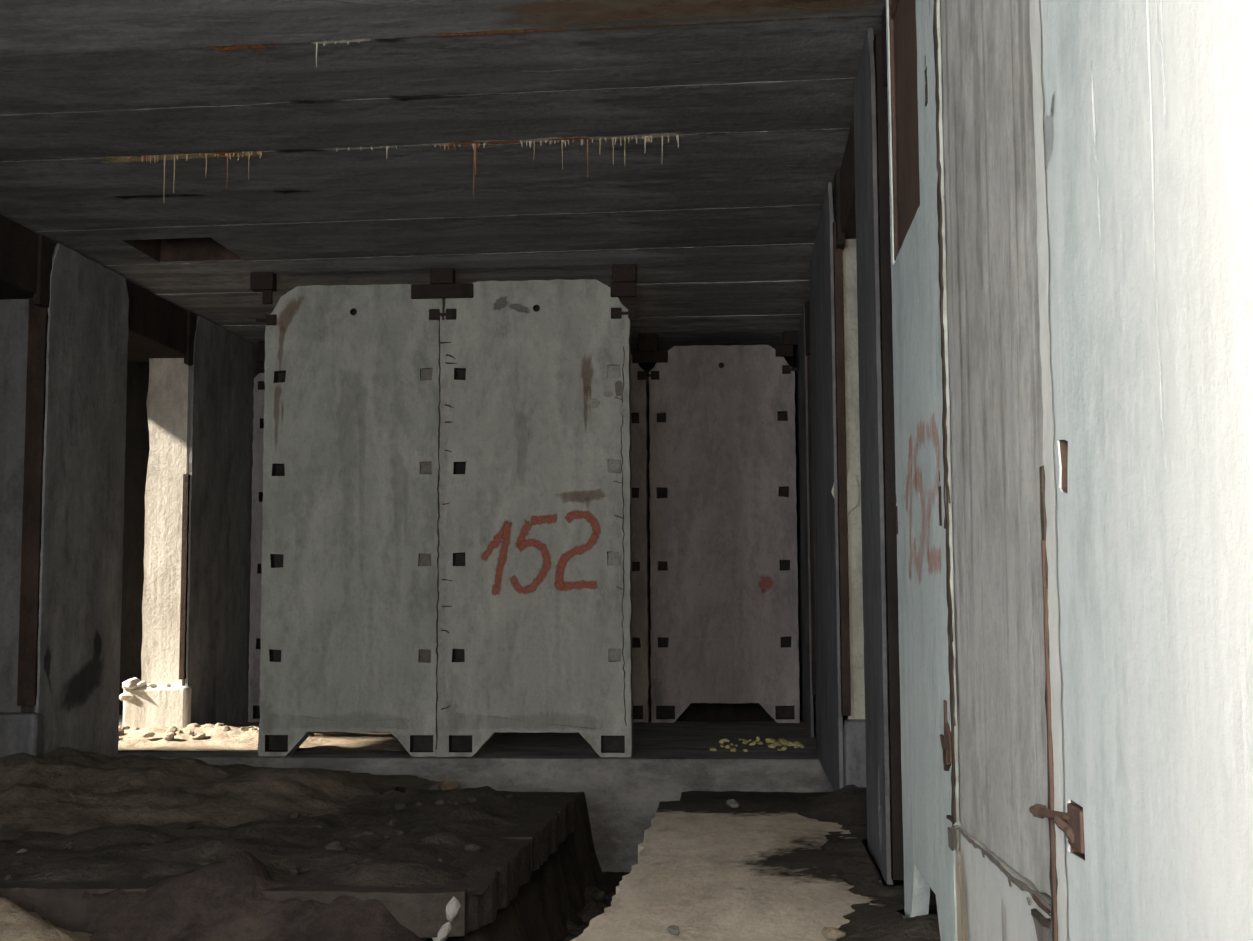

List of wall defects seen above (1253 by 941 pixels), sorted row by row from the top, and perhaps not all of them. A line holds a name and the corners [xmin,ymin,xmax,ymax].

efflorescence [417,133,682,200]
spalling [946,815,960,852]